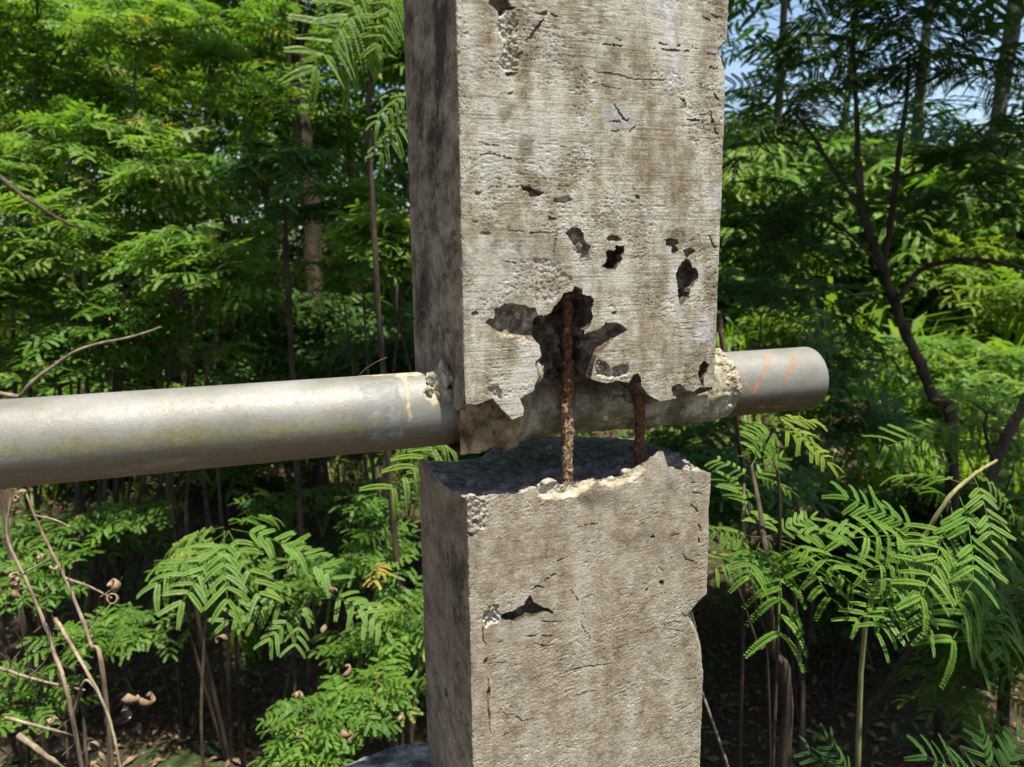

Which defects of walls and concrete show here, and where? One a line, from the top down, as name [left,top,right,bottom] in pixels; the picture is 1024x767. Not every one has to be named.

spalling [488,0,523,77]
spalling [565,227,591,260]
spalling [665,238,699,306]
spalling [471,257,713,401]
peeling [487,384,522,419]
spalling [537,461,647,501]
spalling [467,496,493,540]
spalling [481,595,553,734]